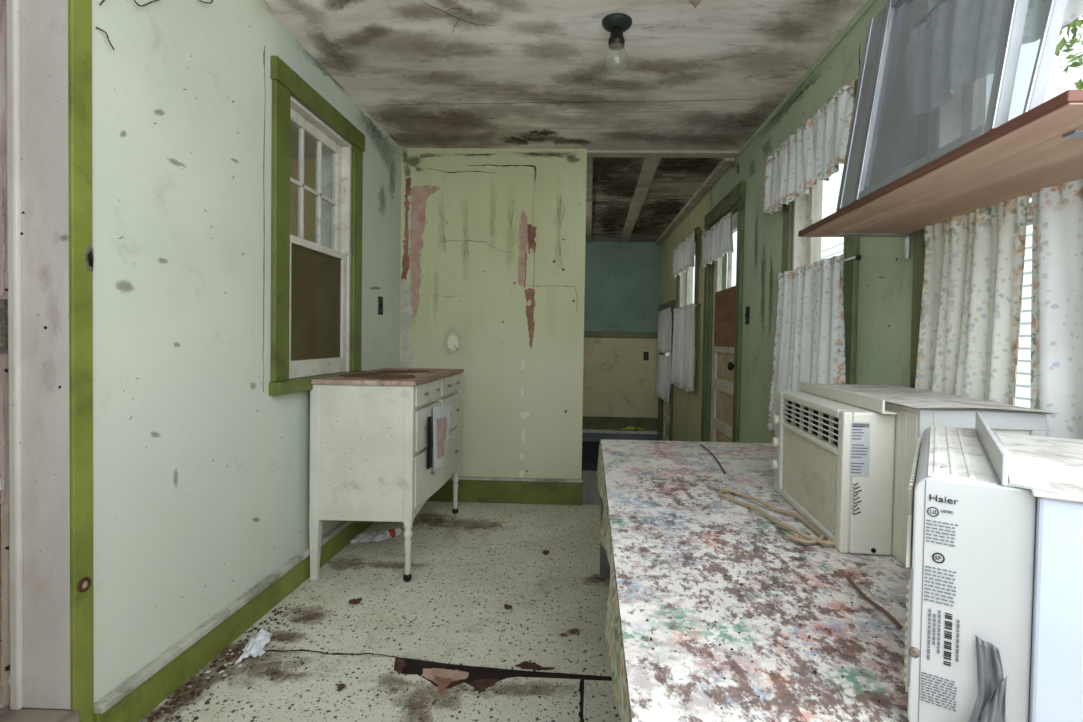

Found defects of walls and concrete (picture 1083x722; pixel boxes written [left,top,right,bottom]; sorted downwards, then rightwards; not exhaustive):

damp [505,130,590,144]
damp [658,158,714,173]
damp [593,157,681,236]
peeling [399,178,440,368]
peeling [514,211,538,348]
crack [231,649,395,657]
crack [577,681,585,722]